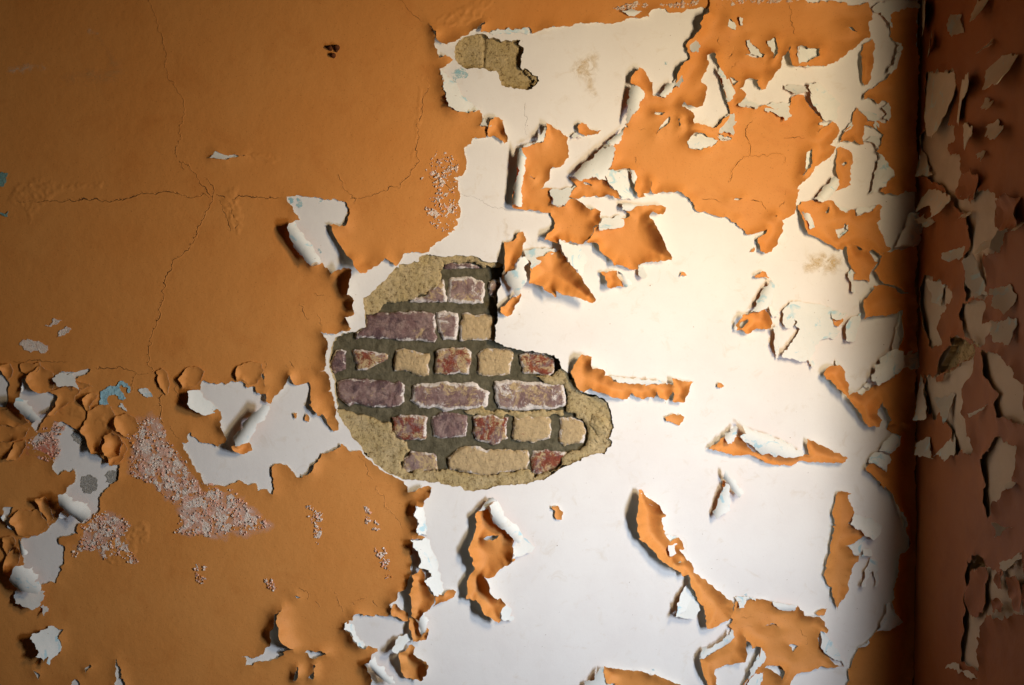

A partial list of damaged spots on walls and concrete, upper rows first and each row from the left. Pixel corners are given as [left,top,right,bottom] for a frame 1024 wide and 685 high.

crack [14,0,284,439]
peeling [923,88,1021,285]
water stain [27,421,65,462]
peeling [0,362,140,678]
water stain [71,511,139,564]
water stain [126,416,271,537]
peeling [178,0,952,685]
peeling [926,290,1024,453]
peeling [964,559,1024,668]
peeling [986,437,1017,516]